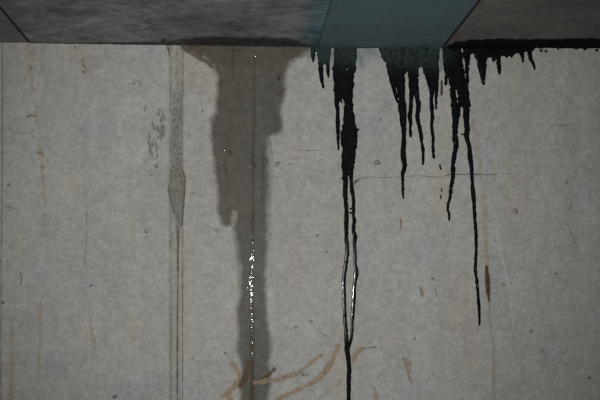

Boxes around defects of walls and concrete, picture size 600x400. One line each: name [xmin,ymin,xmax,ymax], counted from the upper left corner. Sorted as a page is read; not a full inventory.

water stain [357,48,377,68]
water stain [97,36,318,400]
rust [482,197,491,311]
rust [221,344,340,400]